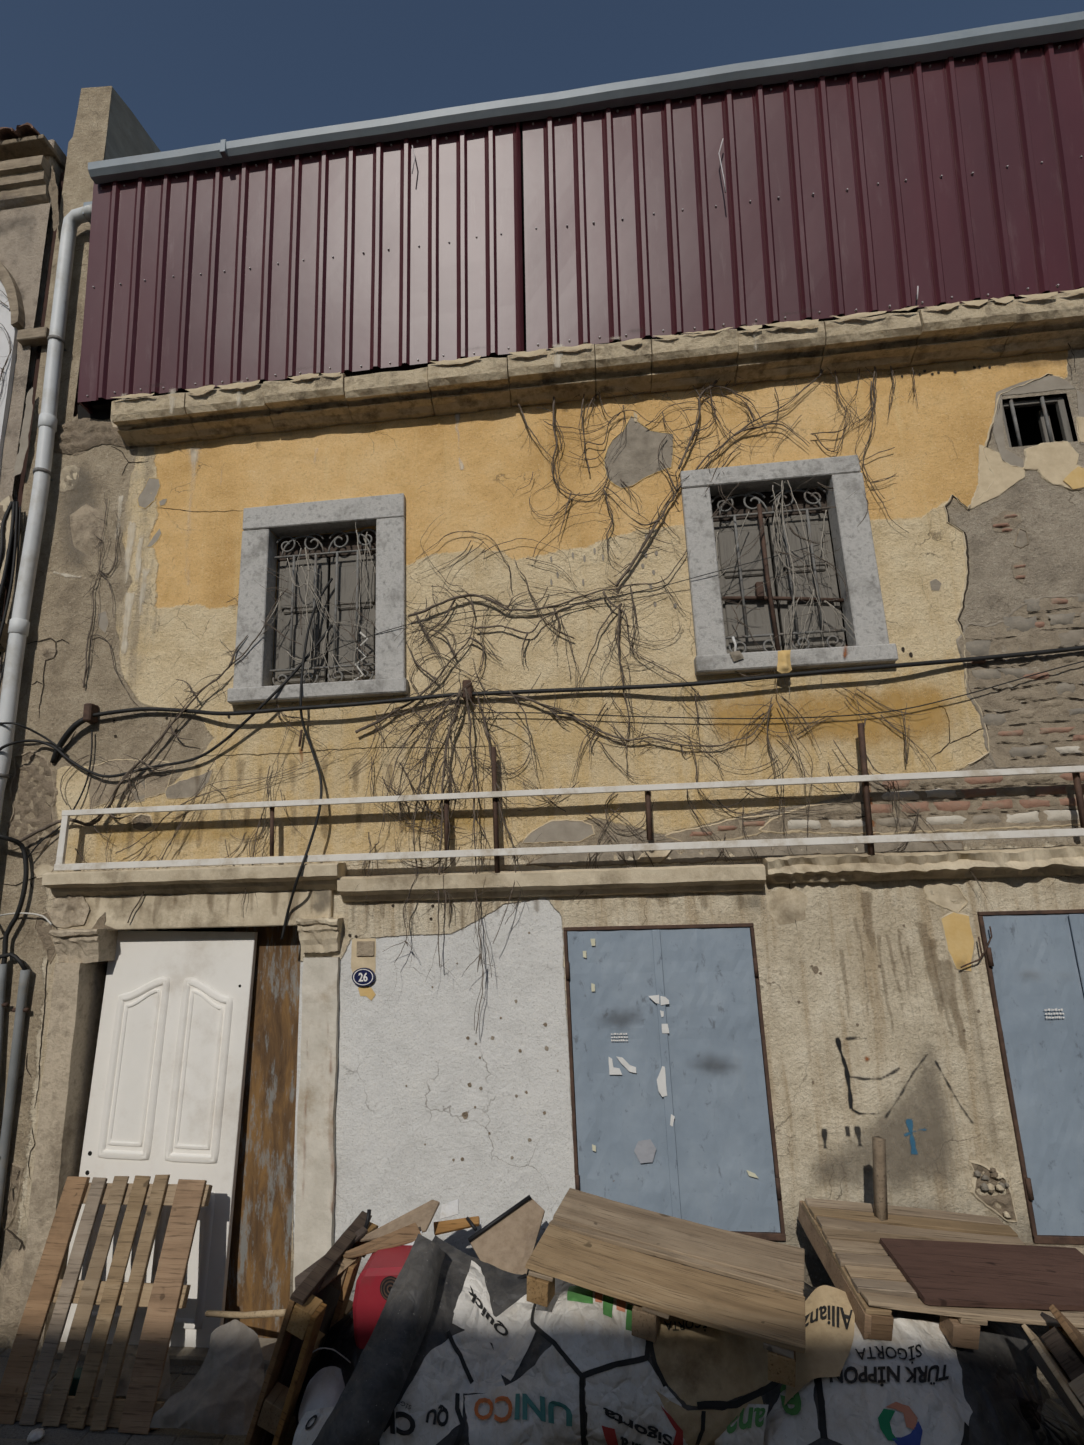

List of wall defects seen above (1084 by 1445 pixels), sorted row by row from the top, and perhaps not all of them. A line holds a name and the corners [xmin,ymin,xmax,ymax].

flaking render [57,450,85,493]
flaking render [138,477,167,509]
flaking render [603,412,675,489]
flaking render [970,376,1084,583]
flaking render [929,578,942,591]
flaking render [522,593,1084,868]
flaking render [87,759,213,832]